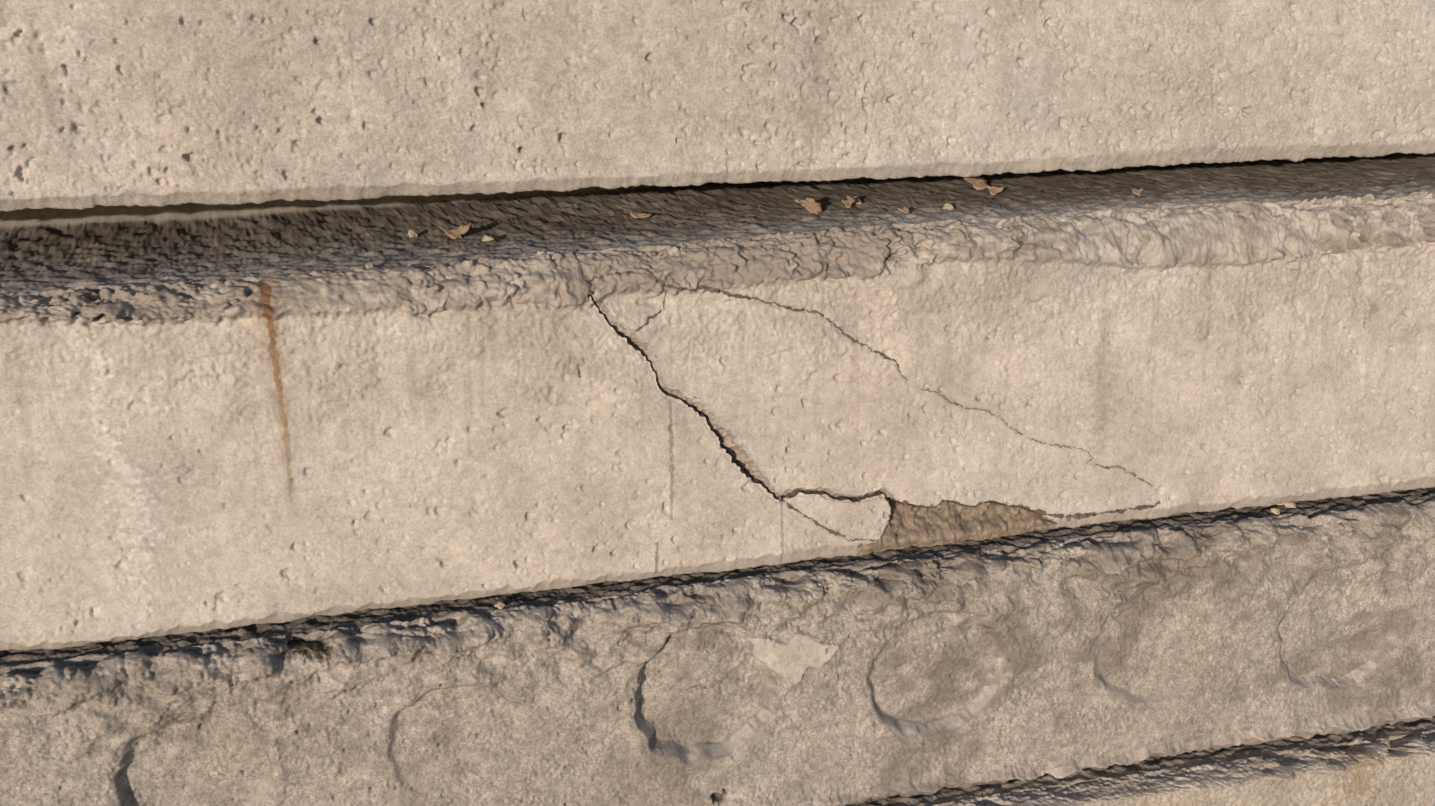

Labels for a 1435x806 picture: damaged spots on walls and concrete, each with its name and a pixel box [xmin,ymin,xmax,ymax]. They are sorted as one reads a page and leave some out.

corrosion [261,284,288,437]
crack [568,249,1161,542]
spalling [0,495,1435,710]